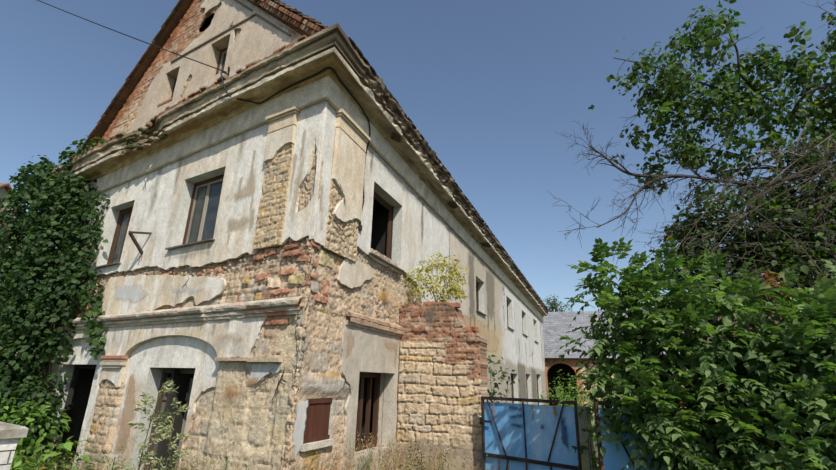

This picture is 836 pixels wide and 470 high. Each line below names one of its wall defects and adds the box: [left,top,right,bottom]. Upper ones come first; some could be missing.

spalling [97,0,222,158]
spalling [247,0,309,37]
spalling [60,130,420,470]